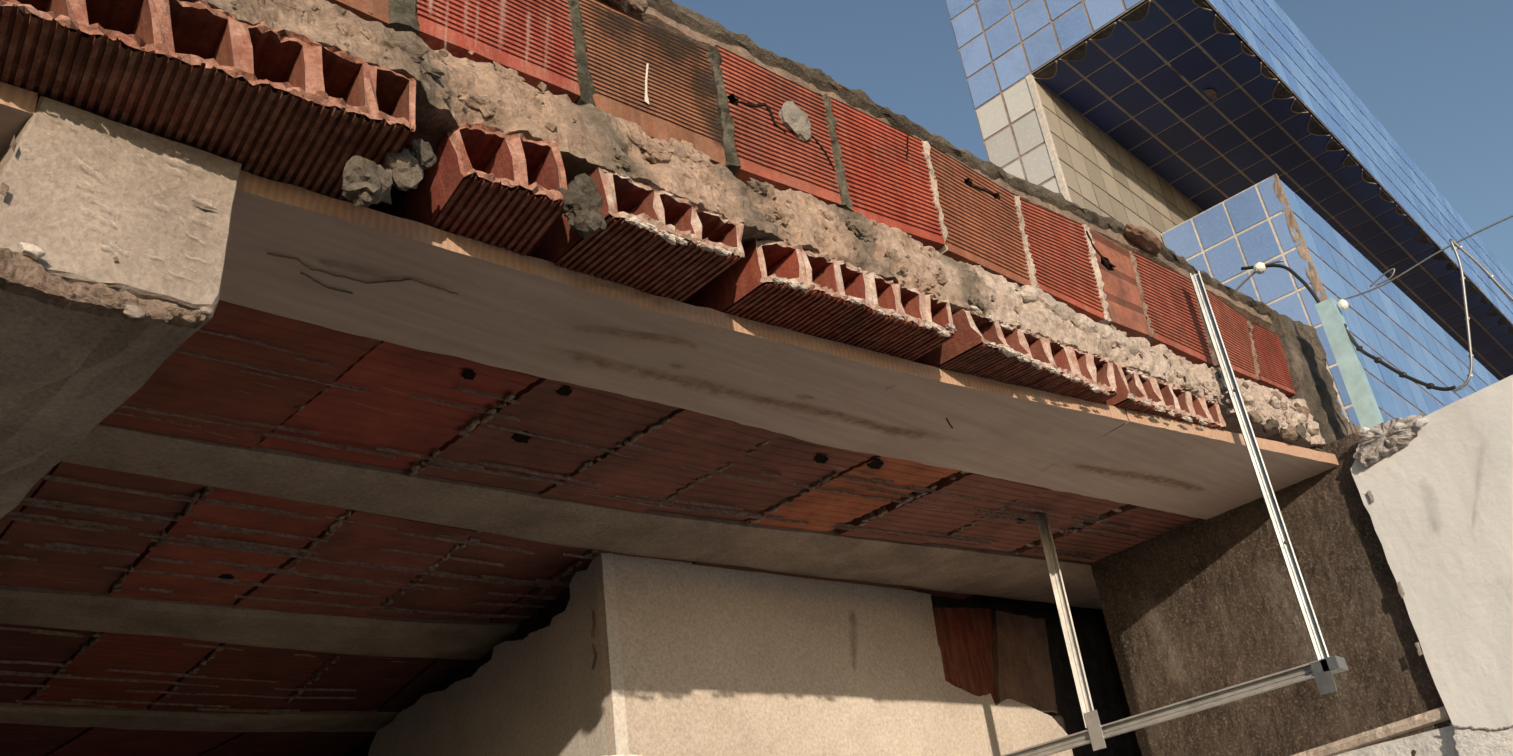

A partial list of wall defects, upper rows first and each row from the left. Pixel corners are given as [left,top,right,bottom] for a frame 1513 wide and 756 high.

spalling [1033,0,1151,79]
crack [736,101,835,170]
spalling [1192,0,1513,335]
spalling [0,242,214,329]
crack [267,252,458,295]
spalling [556,385,573,396]
spalling [511,431,532,443]
spalling [1353,412,1428,468]